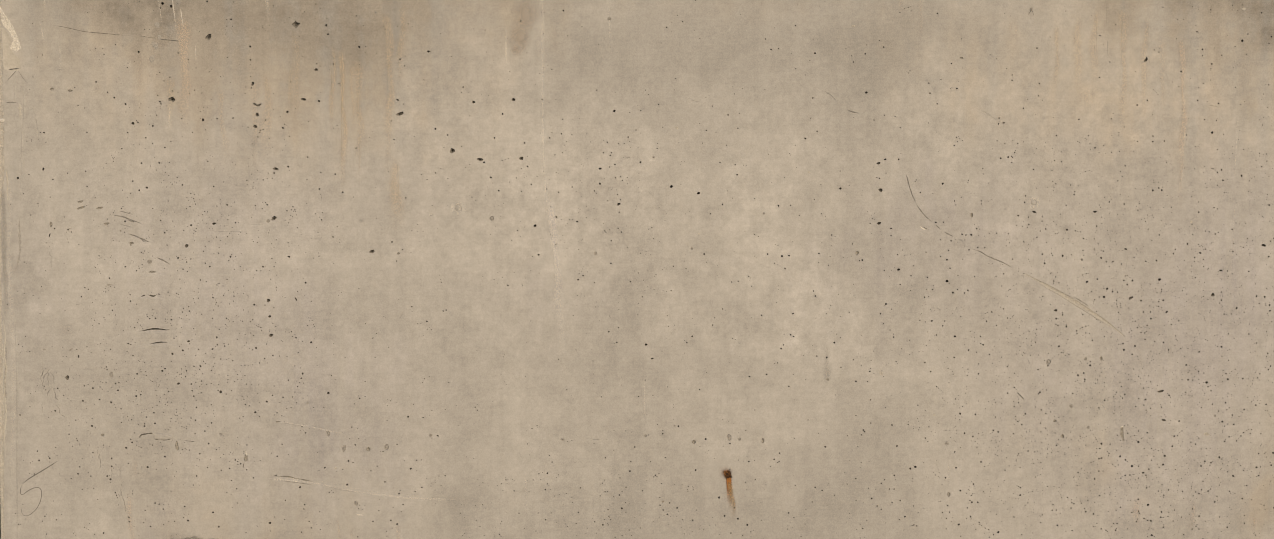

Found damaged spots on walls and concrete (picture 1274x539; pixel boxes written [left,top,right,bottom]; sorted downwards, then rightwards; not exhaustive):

corrosion [724,470,732,497]